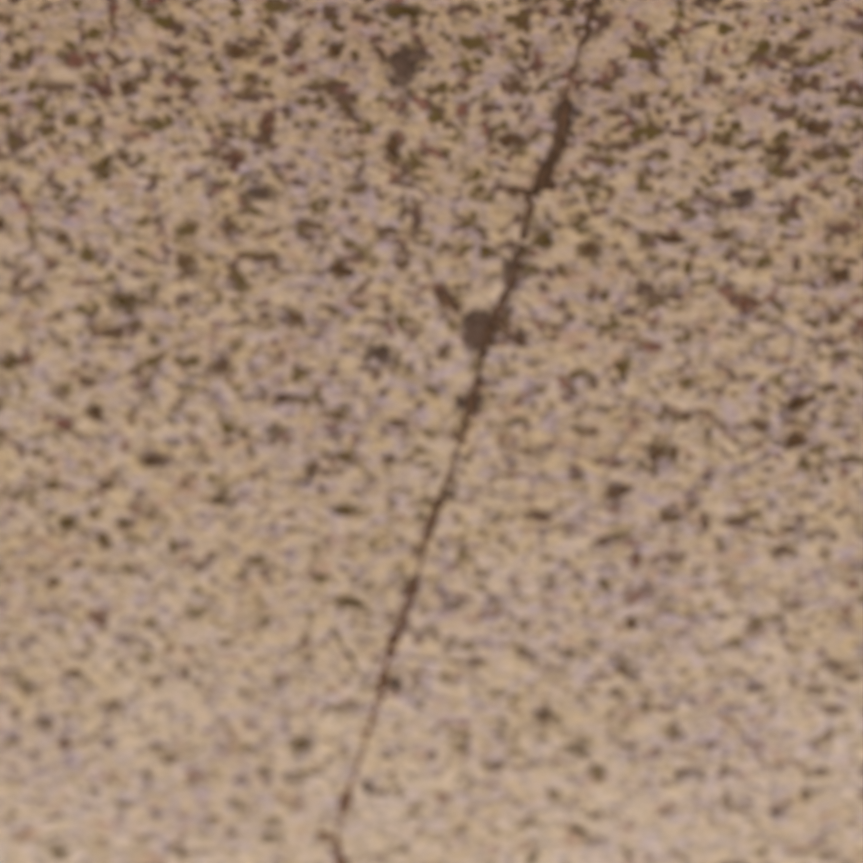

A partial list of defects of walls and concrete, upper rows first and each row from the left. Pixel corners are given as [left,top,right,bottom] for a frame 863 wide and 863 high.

crack [319,0,600,863]